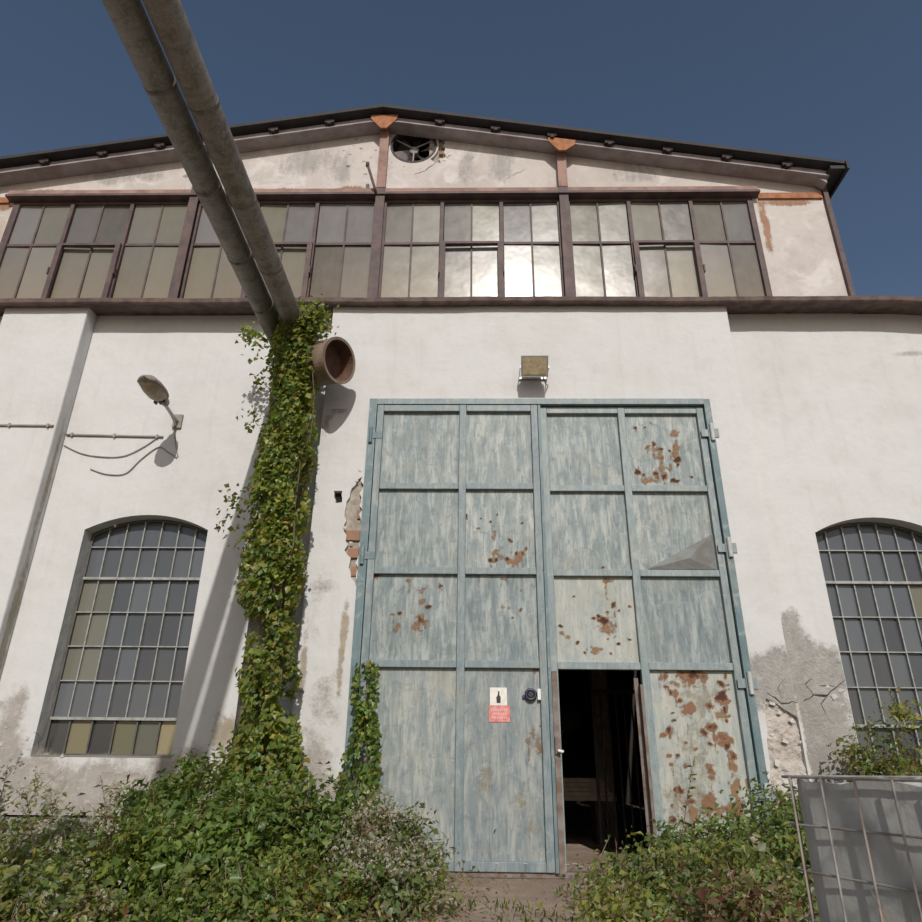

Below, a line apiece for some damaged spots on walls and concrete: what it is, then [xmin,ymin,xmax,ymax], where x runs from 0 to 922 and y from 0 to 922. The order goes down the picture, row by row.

corrosion [634,430,693,485]
flaking render [335,469,363,585]
corrosion [477,514,528,580]
corrosion [412,588,432,631]
corrosion [558,602,632,655]
damp [0,695,210,815]
damp [213,717,235,772]
corrosion [658,671,749,838]
crack [767,679,845,716]
peeling [750,611,864,818]